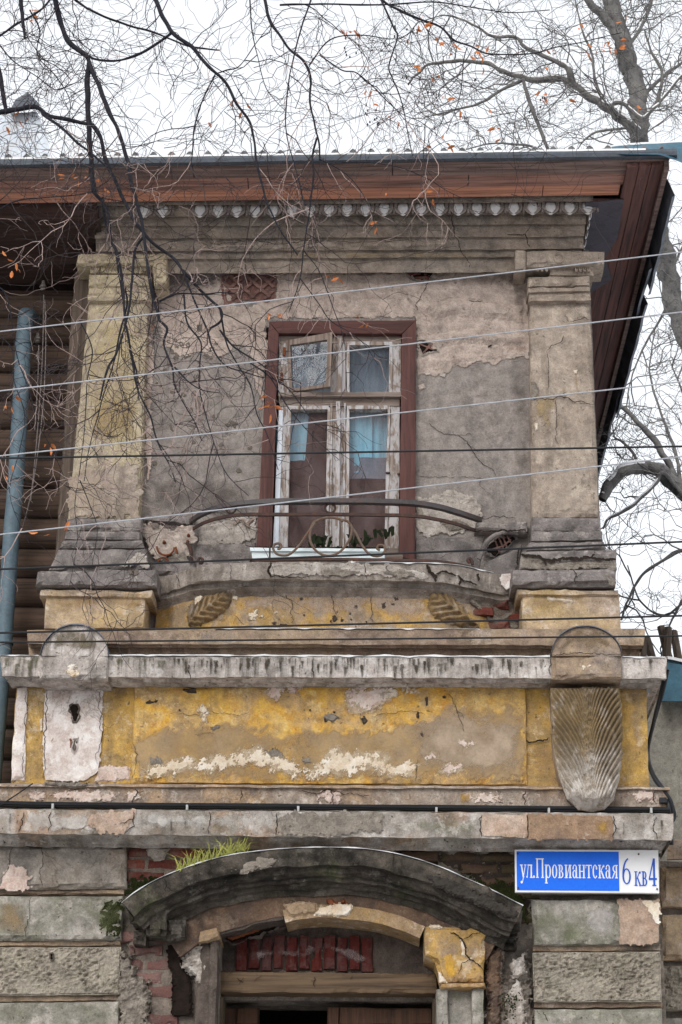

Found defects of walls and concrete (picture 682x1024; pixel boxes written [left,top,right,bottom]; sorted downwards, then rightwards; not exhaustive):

peeling [66,272,529,569]
crack [419,423,616,585]
damp [111,658,454,678]
flaking render [27,687,466,838]
peeling [0,865,33,892]
spalling [231,856,279,874]
spalling [222,898,353,946]
peeling [588,898,662,946]
crack [451,932,482,974]